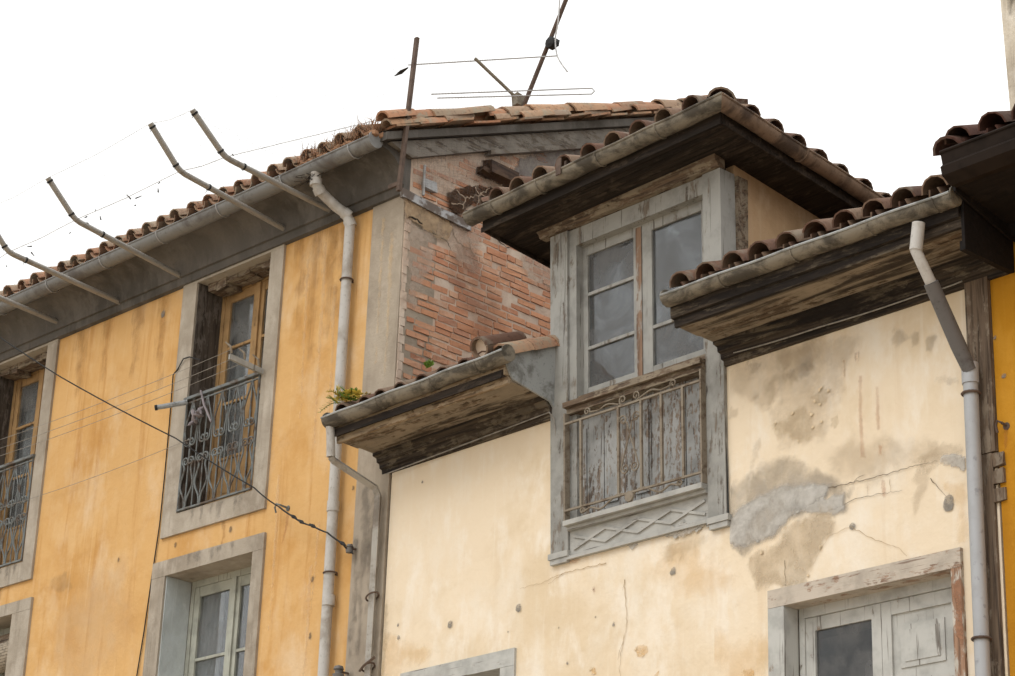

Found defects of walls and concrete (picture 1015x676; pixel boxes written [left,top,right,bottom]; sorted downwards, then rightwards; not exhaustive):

crack [813,461,946,564]